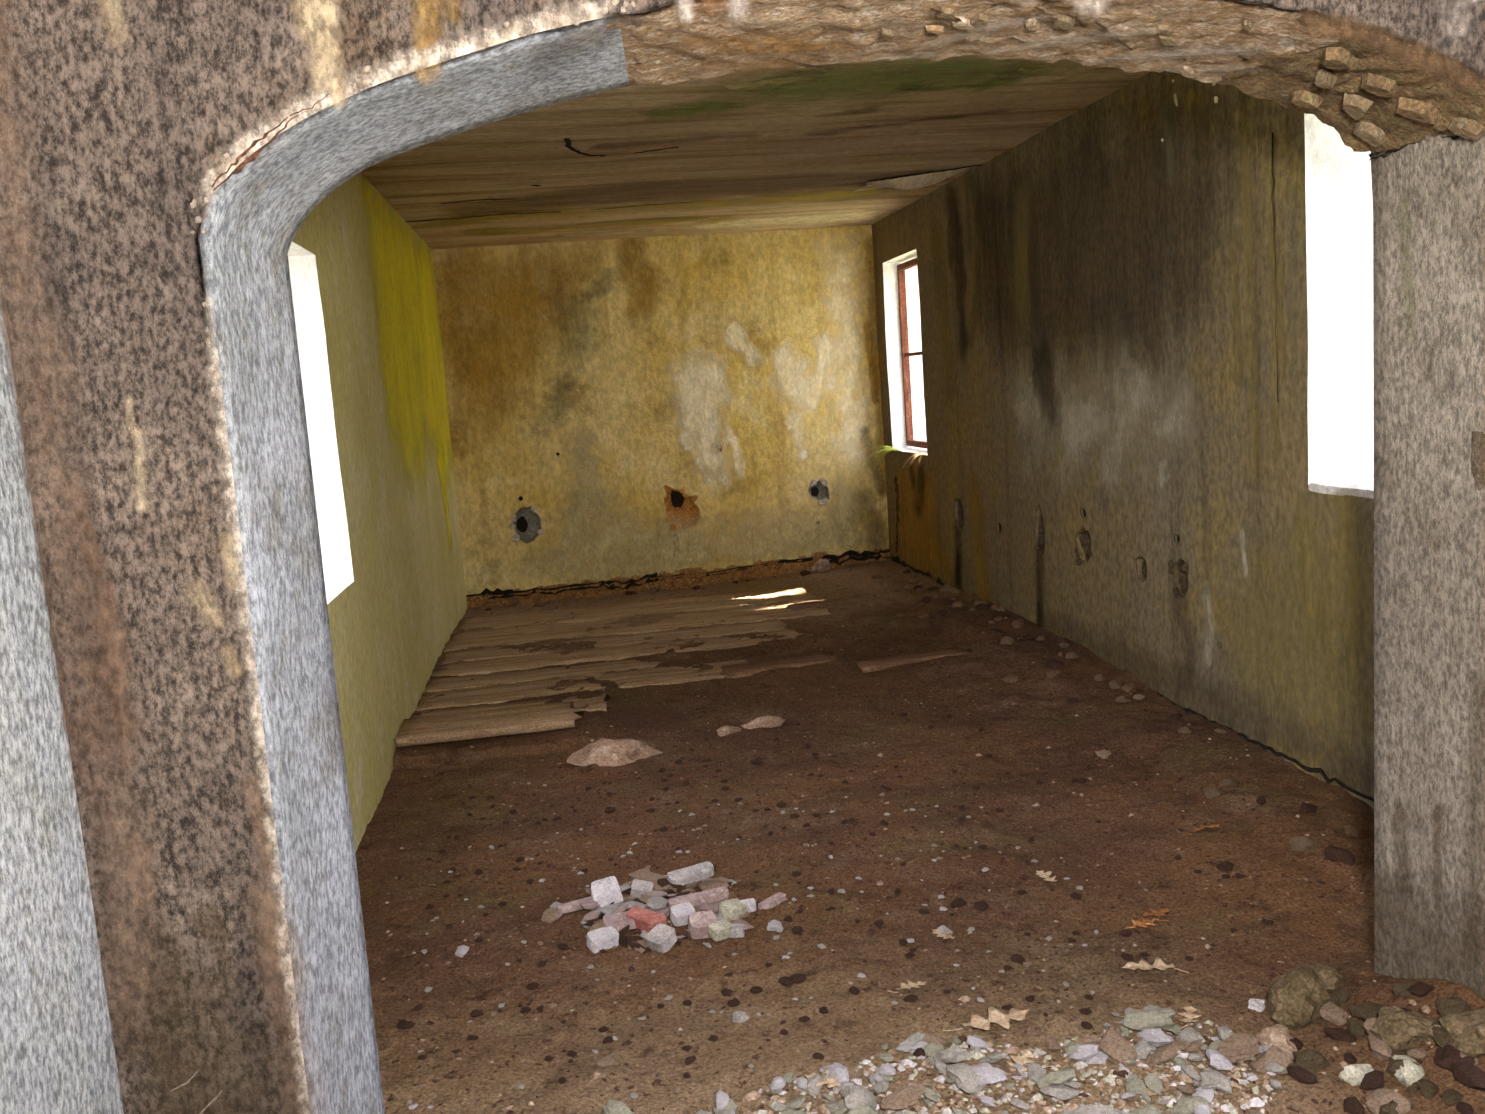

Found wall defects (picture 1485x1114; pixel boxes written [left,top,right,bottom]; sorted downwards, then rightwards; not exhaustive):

flaking render [190,0,1485,235]
damp [949,103,1211,476]
spalling [666,488,698,531]
flaking render [1471,431,1485,491]
crack [1148,688,1374,802]